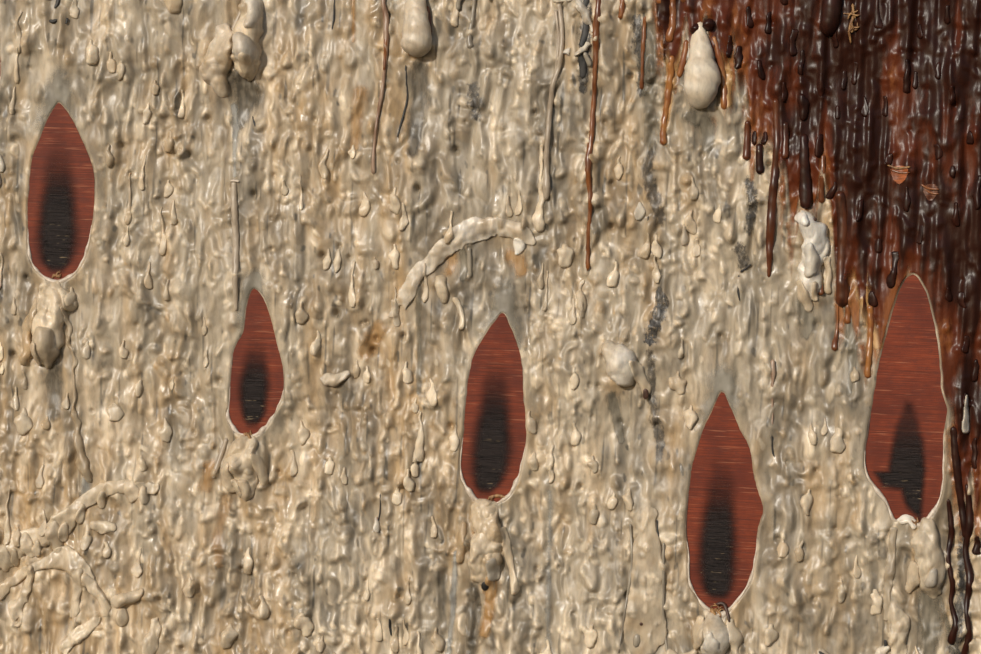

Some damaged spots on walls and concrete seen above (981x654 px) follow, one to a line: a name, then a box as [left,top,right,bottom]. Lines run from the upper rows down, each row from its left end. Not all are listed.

peeling [27,70,95,283]
rust [585,0,601,271]
rust [618,0,626,20]
rust [656,0,686,145]
rust [722,56,732,108]
rust [818,154,826,203]
peeling [226,270,284,439]
peeling [460,281,526,503]
rust [831,273,883,379]
peeling [864,275,947,527]
peeling [686,366,763,622]